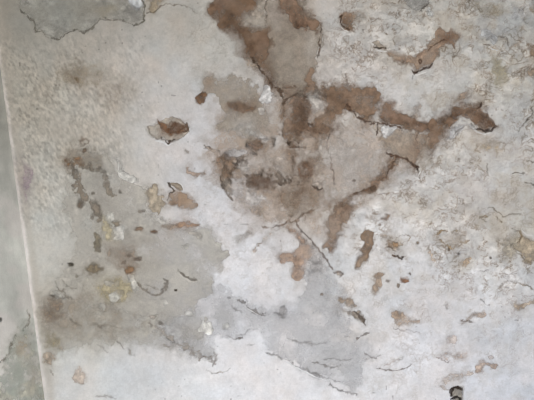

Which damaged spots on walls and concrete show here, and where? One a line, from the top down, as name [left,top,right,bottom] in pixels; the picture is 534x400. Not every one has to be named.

peeling [21,0,162,40]
flaking render [338,12,364,33]
flaking render [372,27,460,76]
crack [251,57,294,105]
flaking render [148,117,190,146]
peeling [309,95,323,109]
water stain [195,0,497,281]
crack [347,104,404,135]
crack [354,153,421,194]
crack [282,210,333,270]
peeling [46,154,362,394]